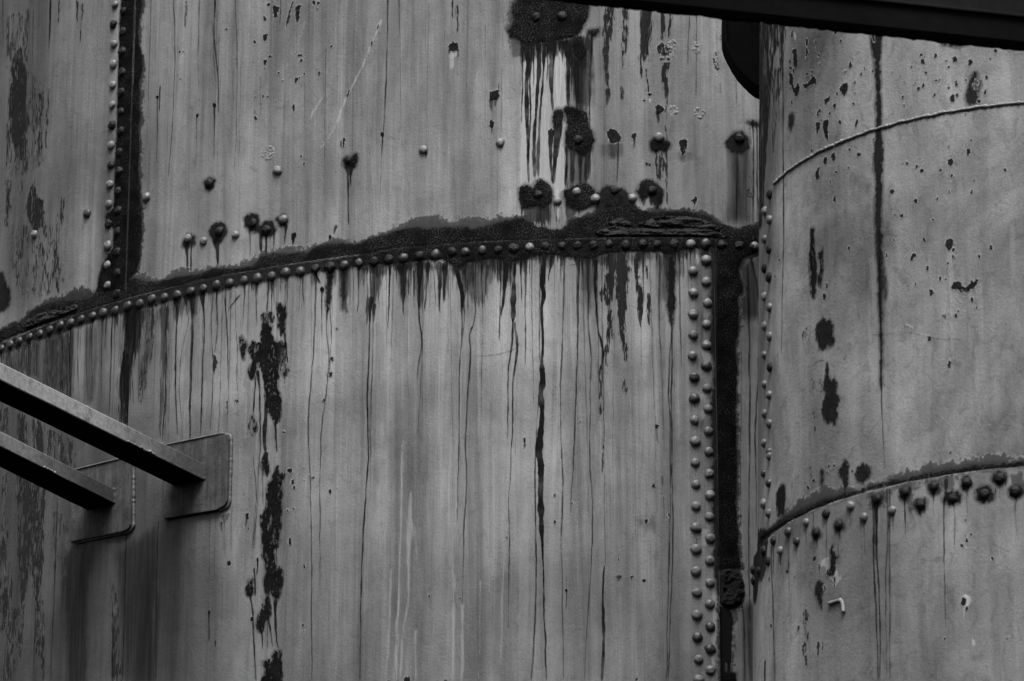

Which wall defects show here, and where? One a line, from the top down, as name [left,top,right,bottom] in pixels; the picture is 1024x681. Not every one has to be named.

corrosion [0,0,759,681]
corrosion [802,317,835,351]
corrosion [811,363,840,431]
corrosion [870,35,887,413]
corrosion [748,452,1024,676]